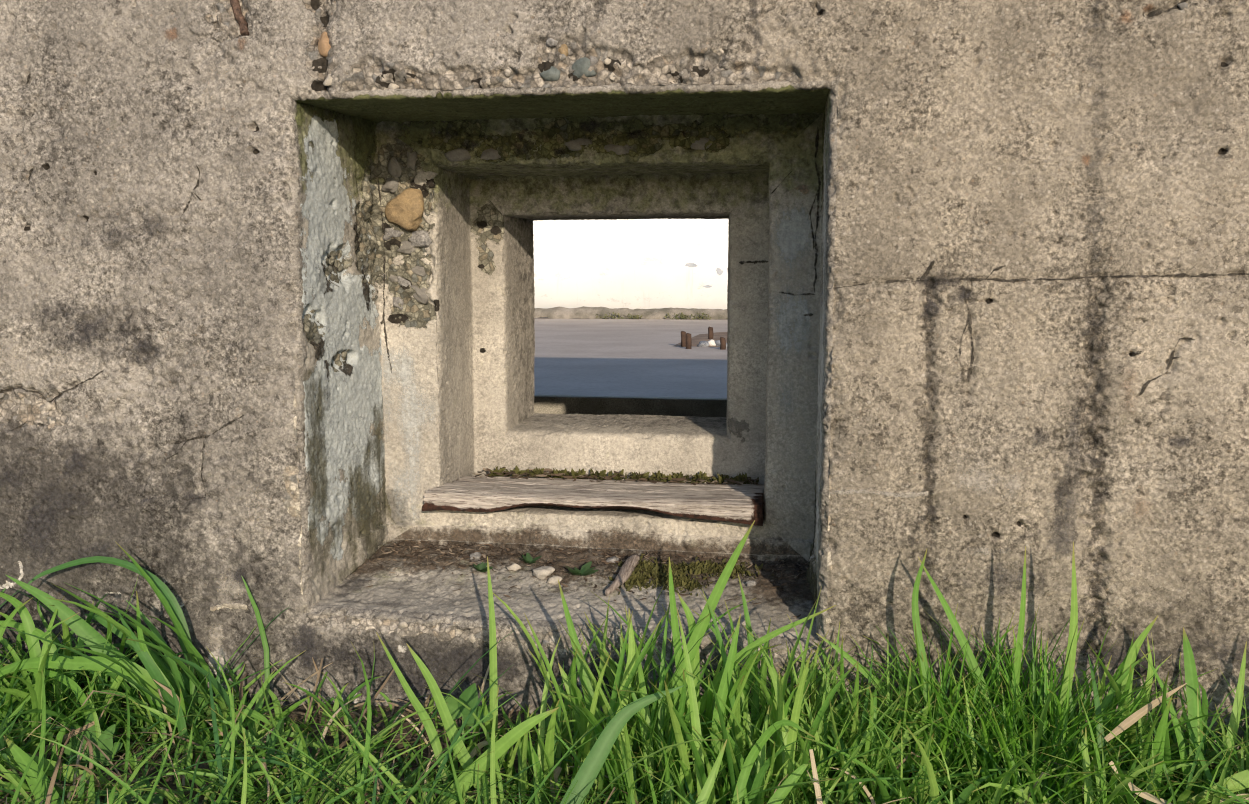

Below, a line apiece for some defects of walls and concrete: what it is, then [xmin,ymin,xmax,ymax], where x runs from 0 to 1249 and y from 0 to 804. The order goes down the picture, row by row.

corrosion [230,0,249,36]
crack [1148,0,1187,16]
damp [295,101,377,194]
damp [920,273,973,320]
peeling [283,115,730,595]